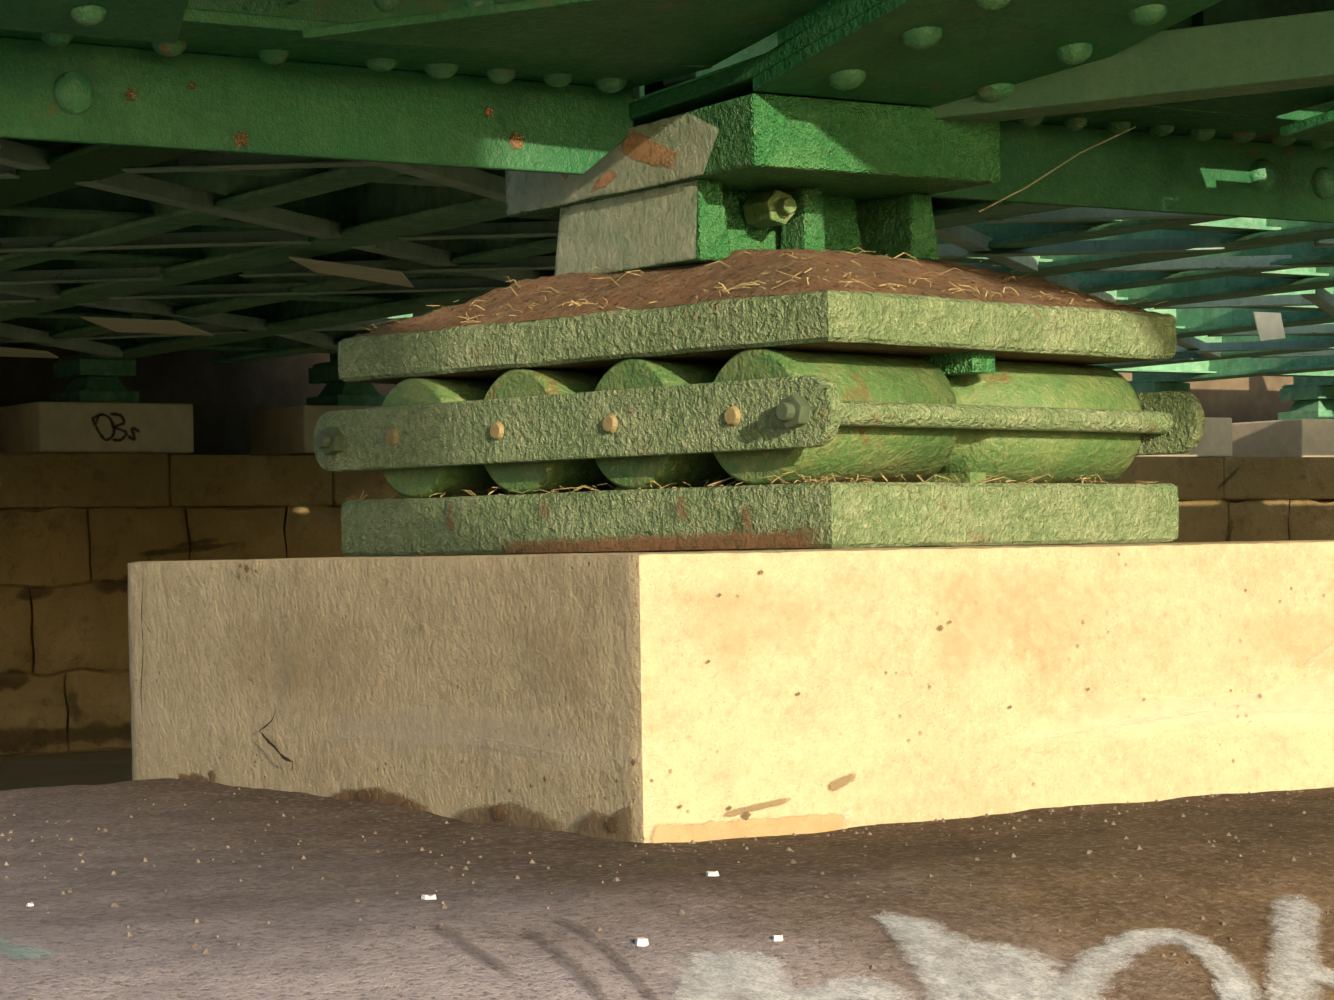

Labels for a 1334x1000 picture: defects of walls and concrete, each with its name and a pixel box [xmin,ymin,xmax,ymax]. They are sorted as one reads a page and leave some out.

corrosion [509,132,524,148]
peeling [505,113,719,276]
corrosion [506,506,816,553]
crack [259,709,293,770]